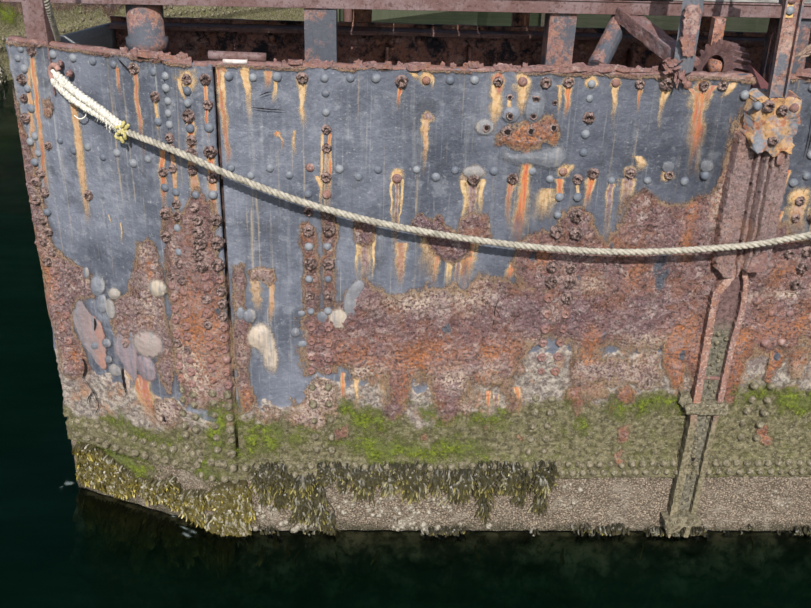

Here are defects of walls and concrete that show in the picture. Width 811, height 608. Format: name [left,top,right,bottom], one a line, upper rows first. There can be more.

corrosion [0,0,23,14]
corrosion [51,3,123,17]
corrosion [678,3,702,58]
corrosion [6,40,209,129]
corrosion [216,64,314,155]
corrosion [411,70,674,119]
corrosion [685,76,756,143]
corrosion [13,58,95,380]
corrosion [295,103,747,427]
corrosion [724,189,811,404]
peeling [73,300,138,384]